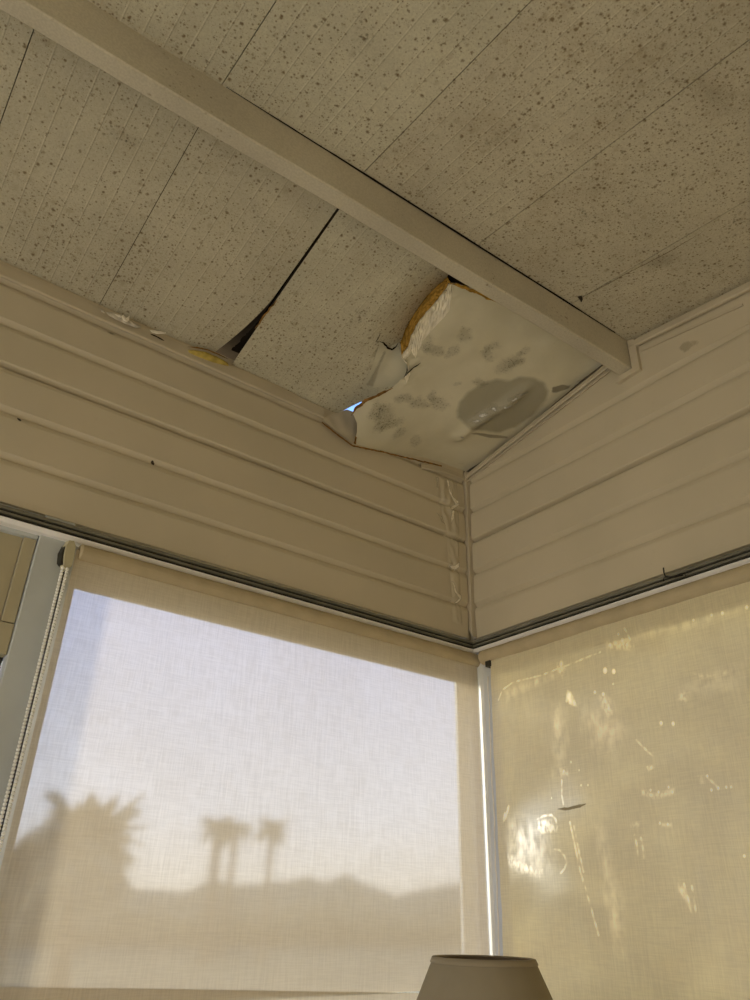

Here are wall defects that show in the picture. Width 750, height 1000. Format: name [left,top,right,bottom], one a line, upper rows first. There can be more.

crack [226,87,697,353]